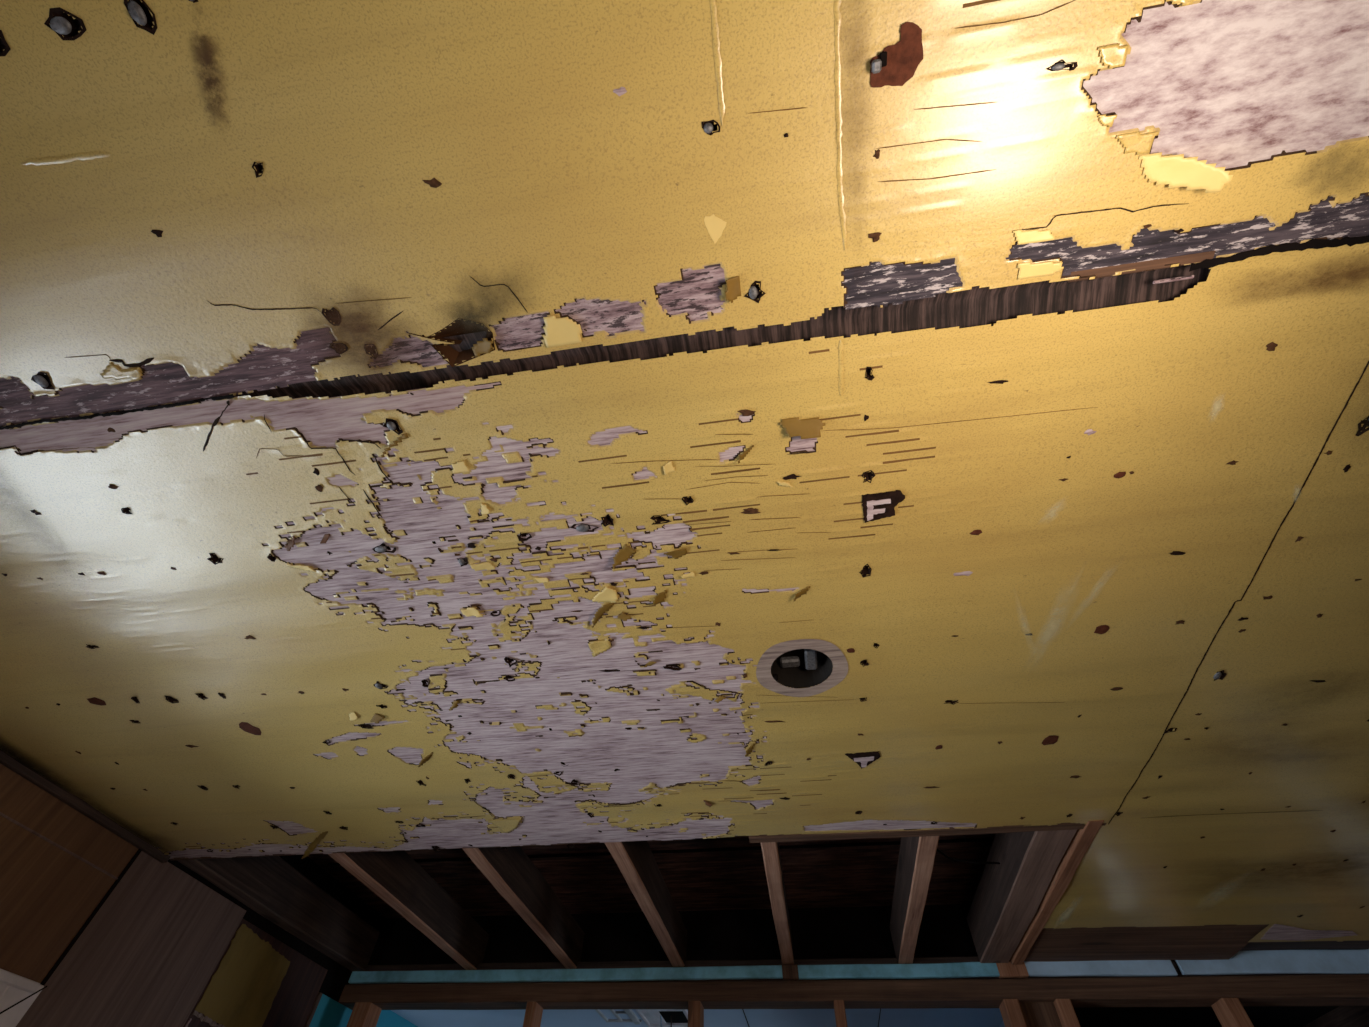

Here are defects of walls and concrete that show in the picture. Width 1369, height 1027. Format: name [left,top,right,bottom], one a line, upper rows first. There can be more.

rust [870,22,923,88]
crack [959,0,1075,28]
peeling [1083,0,1369,193]
crack [876,102,996,182]
crack [1013,203,1189,234]
peeling [1006,194,1369,280]
peeling [374,264,741,368]
peeling [842,258,963,310]
crack [0,235,1369,518]
peeling [779,417,825,452]
peeling [0,327,773,859]
crack [1108,361,1369,824]